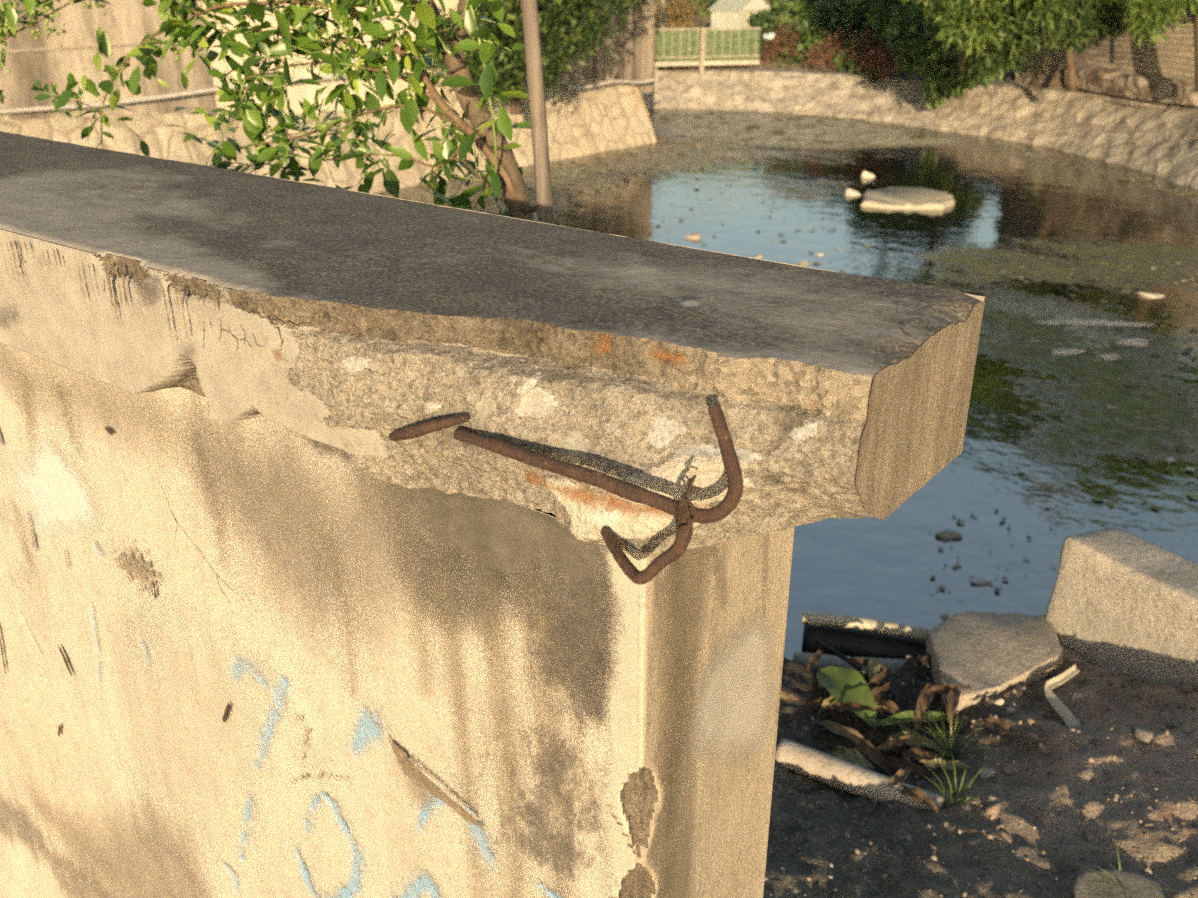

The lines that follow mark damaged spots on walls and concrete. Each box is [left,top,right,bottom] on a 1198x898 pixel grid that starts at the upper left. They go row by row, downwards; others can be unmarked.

peeling [95,253,233,306]
spalling [259,314,881,553]
rust [565,489,634,511]
leakage [196,443,625,735]
leakage [497,733,607,878]
peeling [619,767,658,898]